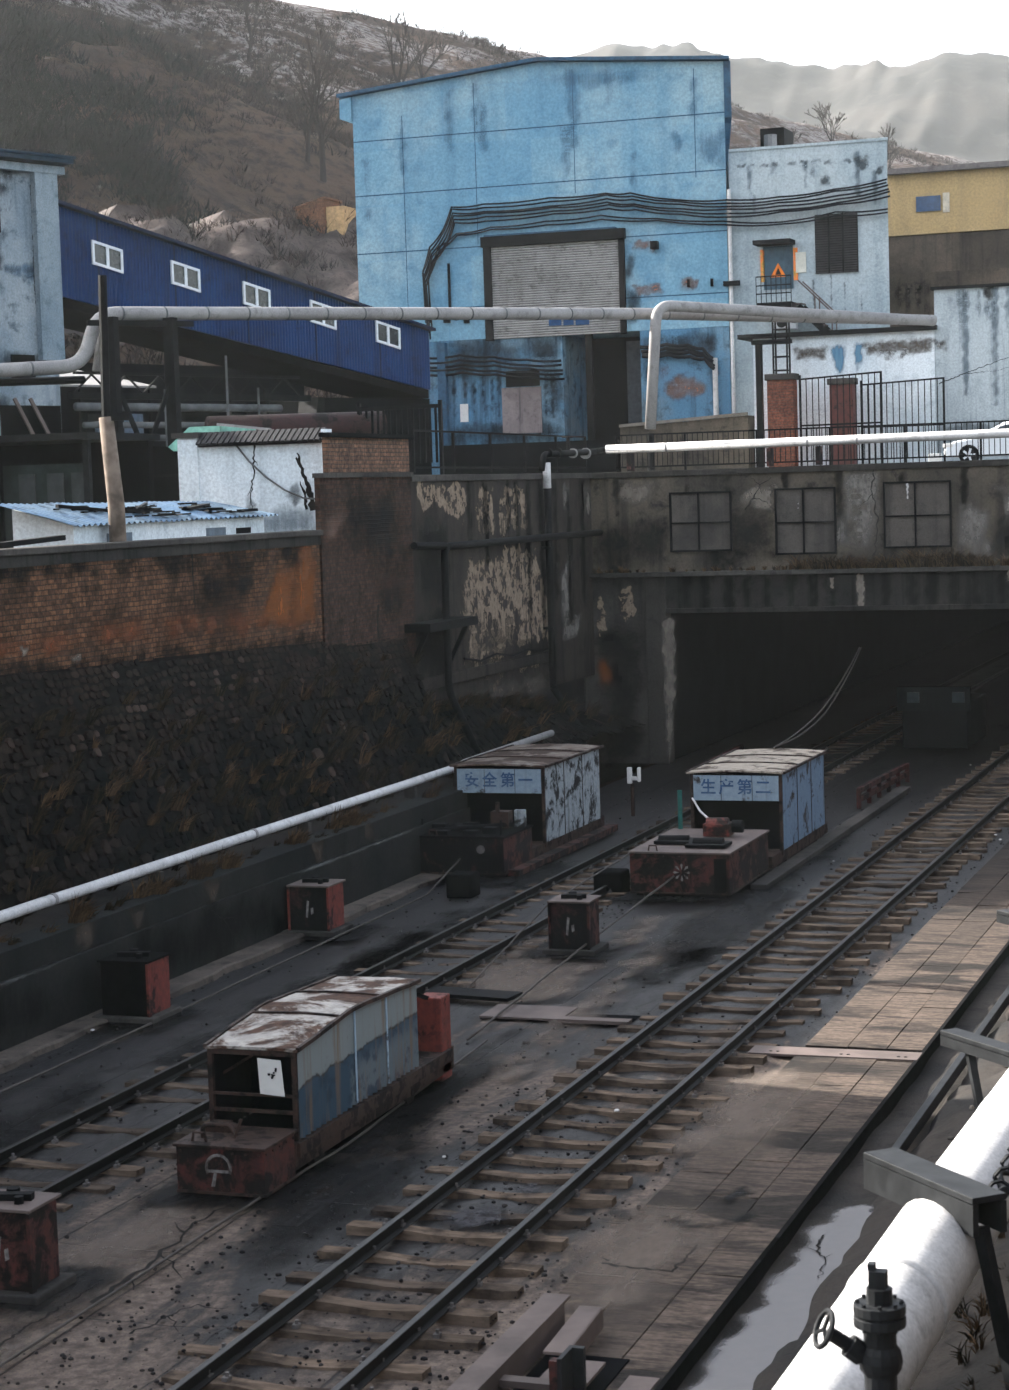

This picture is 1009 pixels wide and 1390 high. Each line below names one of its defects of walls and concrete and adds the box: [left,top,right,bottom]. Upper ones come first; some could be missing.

leakage [958,287,998,384]
peeling [666,377,705,399]
flaking render [416,481,581,691]
spalling [597,585,637,637]